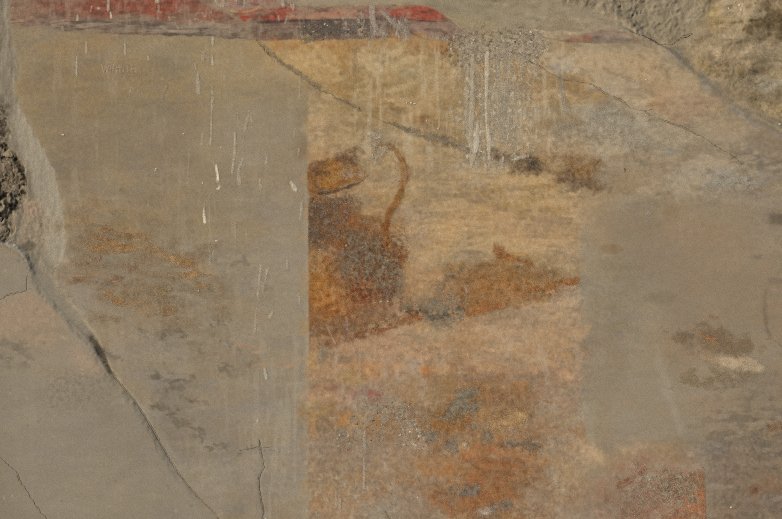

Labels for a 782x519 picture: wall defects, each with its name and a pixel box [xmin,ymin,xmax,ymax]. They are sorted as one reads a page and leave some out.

crack [258,41,360,109]
crack [380,120,448,144]
damp [449,31,545,174]
crack [532,62,740,162]
spalling [0,144,27,242]
rust [308,144,424,345]
rust [444,246,578,315]
crack [90,337,219,519]